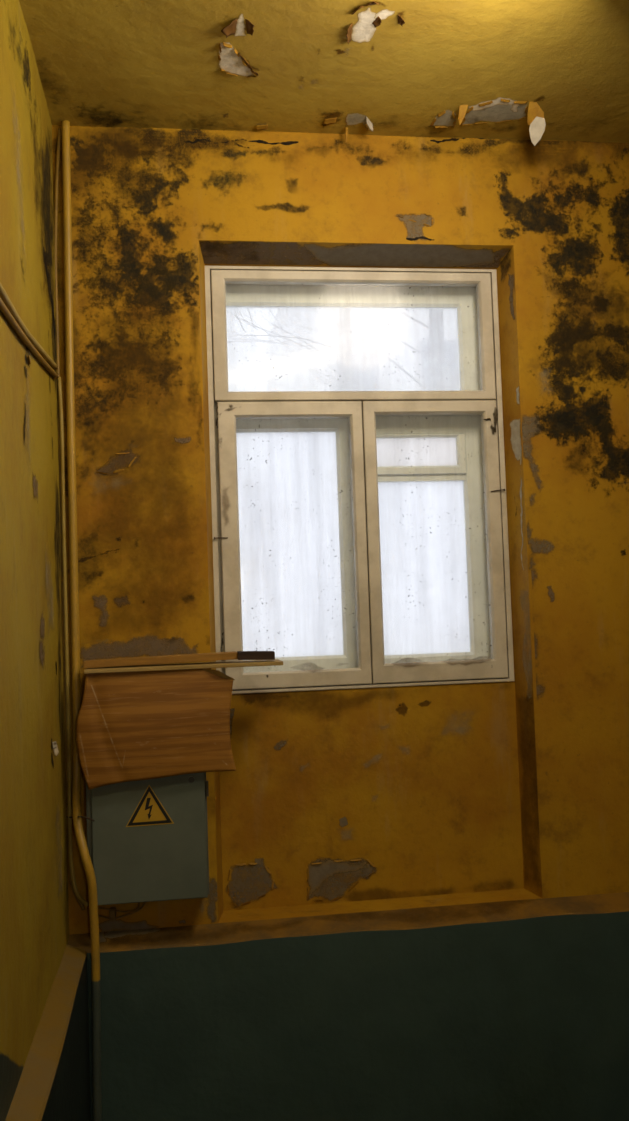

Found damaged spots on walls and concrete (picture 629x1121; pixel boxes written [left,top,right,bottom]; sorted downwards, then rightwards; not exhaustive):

damp [13,29,46,90]
peeling [218,14,258,78]
peeling [336,1,405,54]
peeling [430,96,546,146]
damp [361,156,384,165]
damp [31,117,279,455]
spalling [200,213,515,319]
damp [495,148,629,495]
damp [55,468,68,734]
spalling [207,858,277,922]
spalling [307,858,376,901]